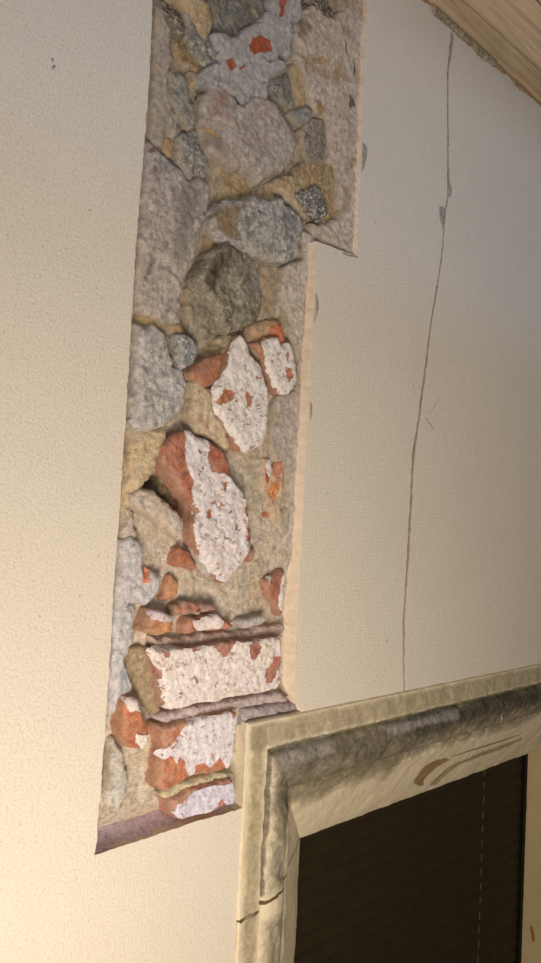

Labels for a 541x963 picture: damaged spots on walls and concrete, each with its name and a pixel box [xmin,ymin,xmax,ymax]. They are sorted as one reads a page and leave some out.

flaking render [94,0,367,855]
crack [403,32,454,691]
crack [240,888,284,924]